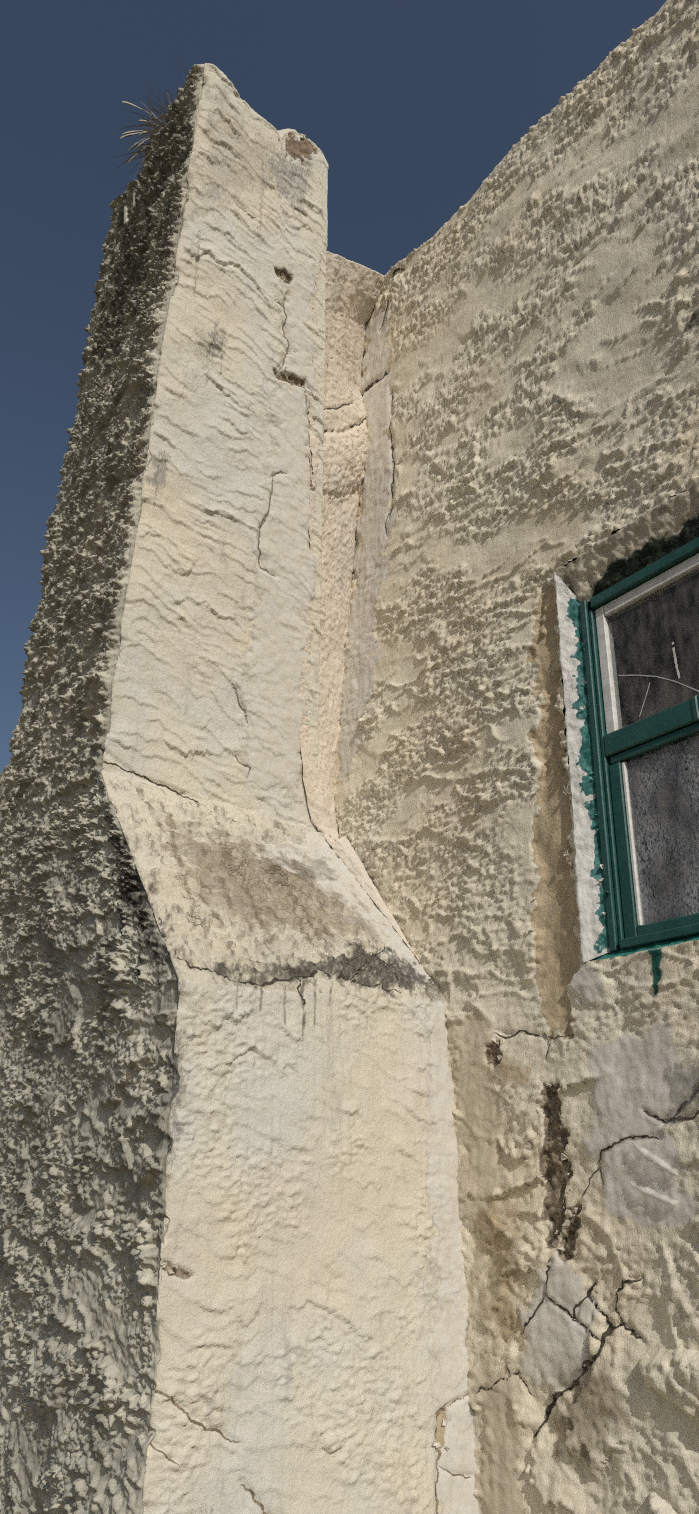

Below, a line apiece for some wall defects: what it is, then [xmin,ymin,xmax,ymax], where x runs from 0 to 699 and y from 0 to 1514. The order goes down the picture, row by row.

crack [257,471,287,576]
crack [581,1090,699,1198]
crack [435,1259,643,1514]